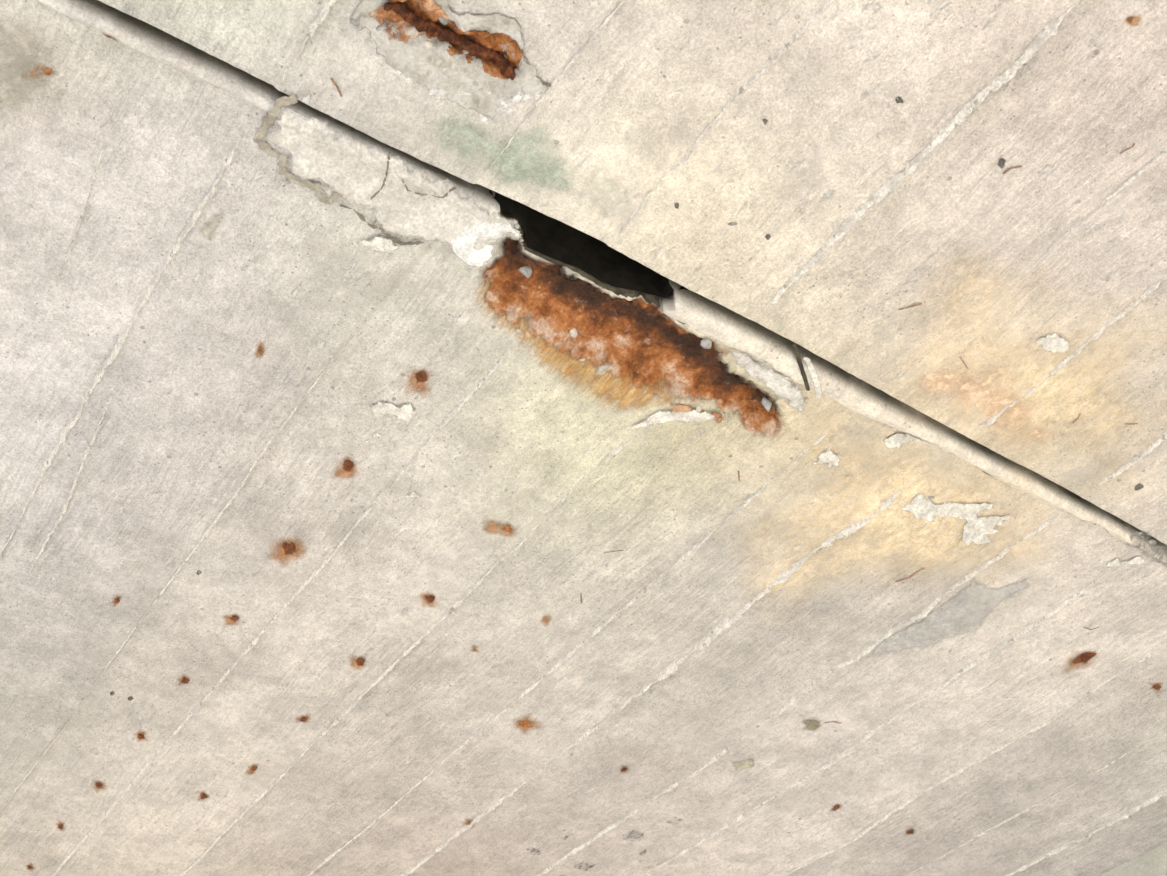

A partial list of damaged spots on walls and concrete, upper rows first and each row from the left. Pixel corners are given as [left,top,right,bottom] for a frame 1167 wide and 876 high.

spalling [350,0,551,121]
crack [371,152,456,200]
spalling [451,190,805,436]
rust [335,460,355,477]
rust [485,522,514,535]
peeling [902,494,1011,546]
rust [273,541,302,561]
rust [422,594,435,606]
rust [1069,653,1096,667]
rust [516,717,536,732]